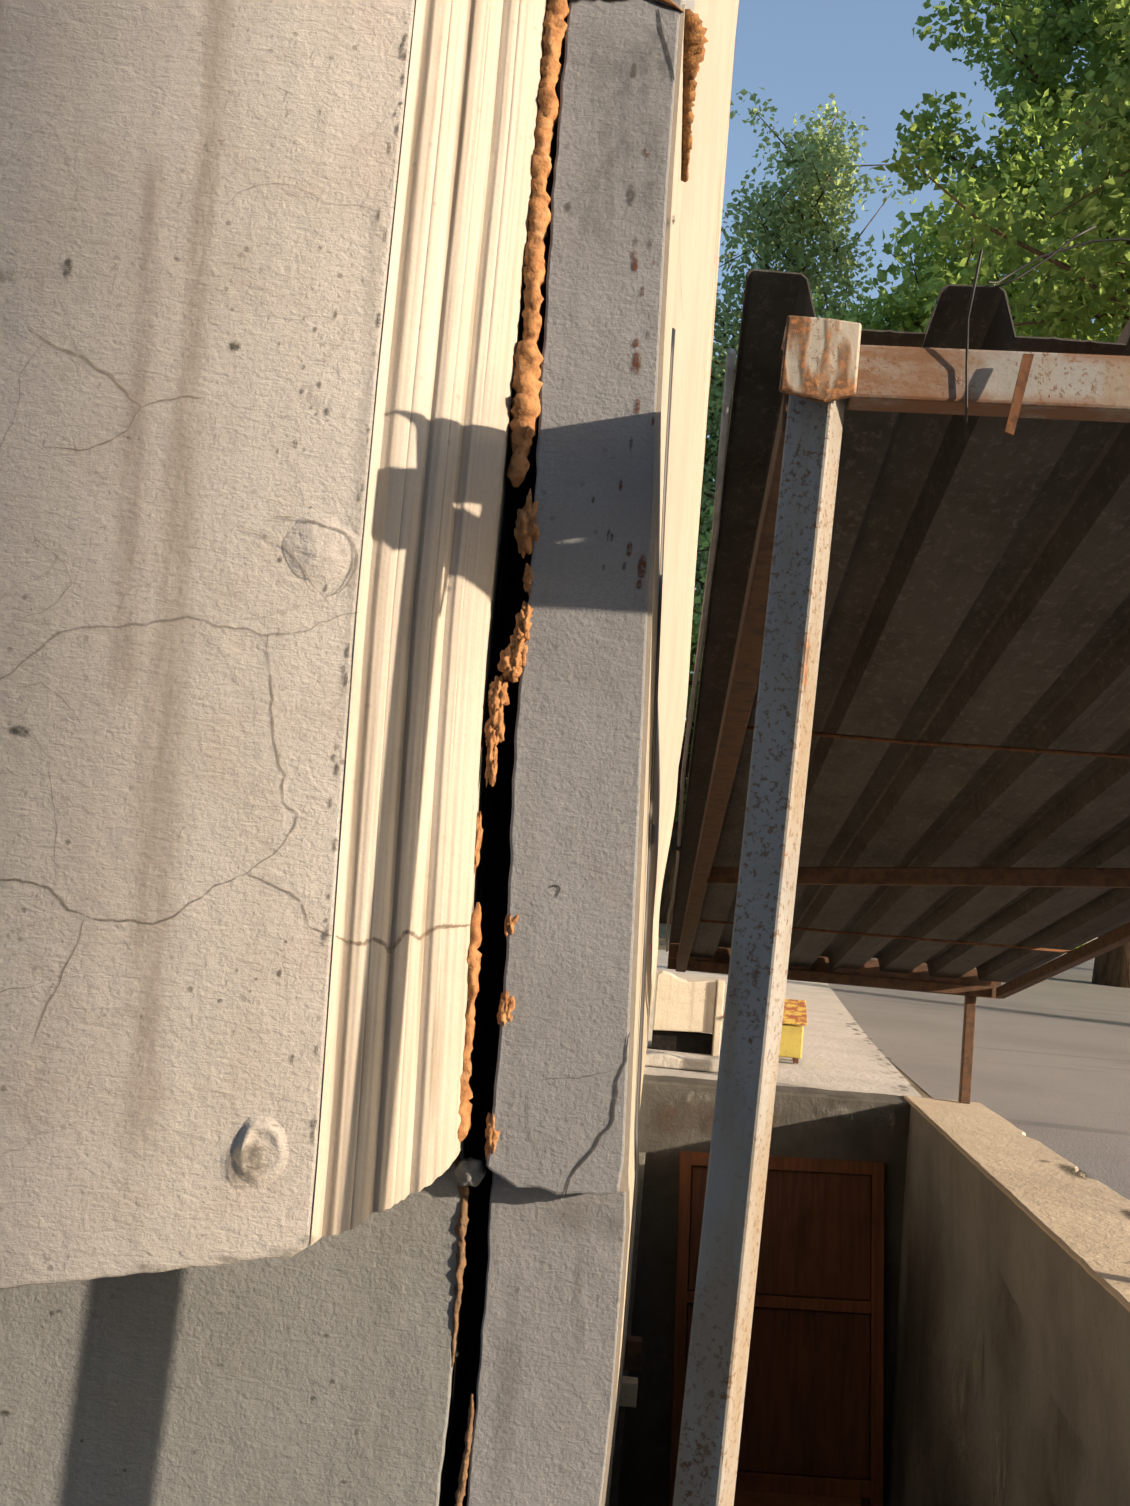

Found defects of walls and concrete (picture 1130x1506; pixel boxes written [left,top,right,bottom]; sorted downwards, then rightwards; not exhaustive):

corrosion [632,239,655,296]
crack [28,328,204,451]
corrosion [632,333,650,373]
corrosion [602,530,646,589]
crack [0,636,470,1044]
crack [527,1033,630,1195]
crack [441,1119,492,1506]